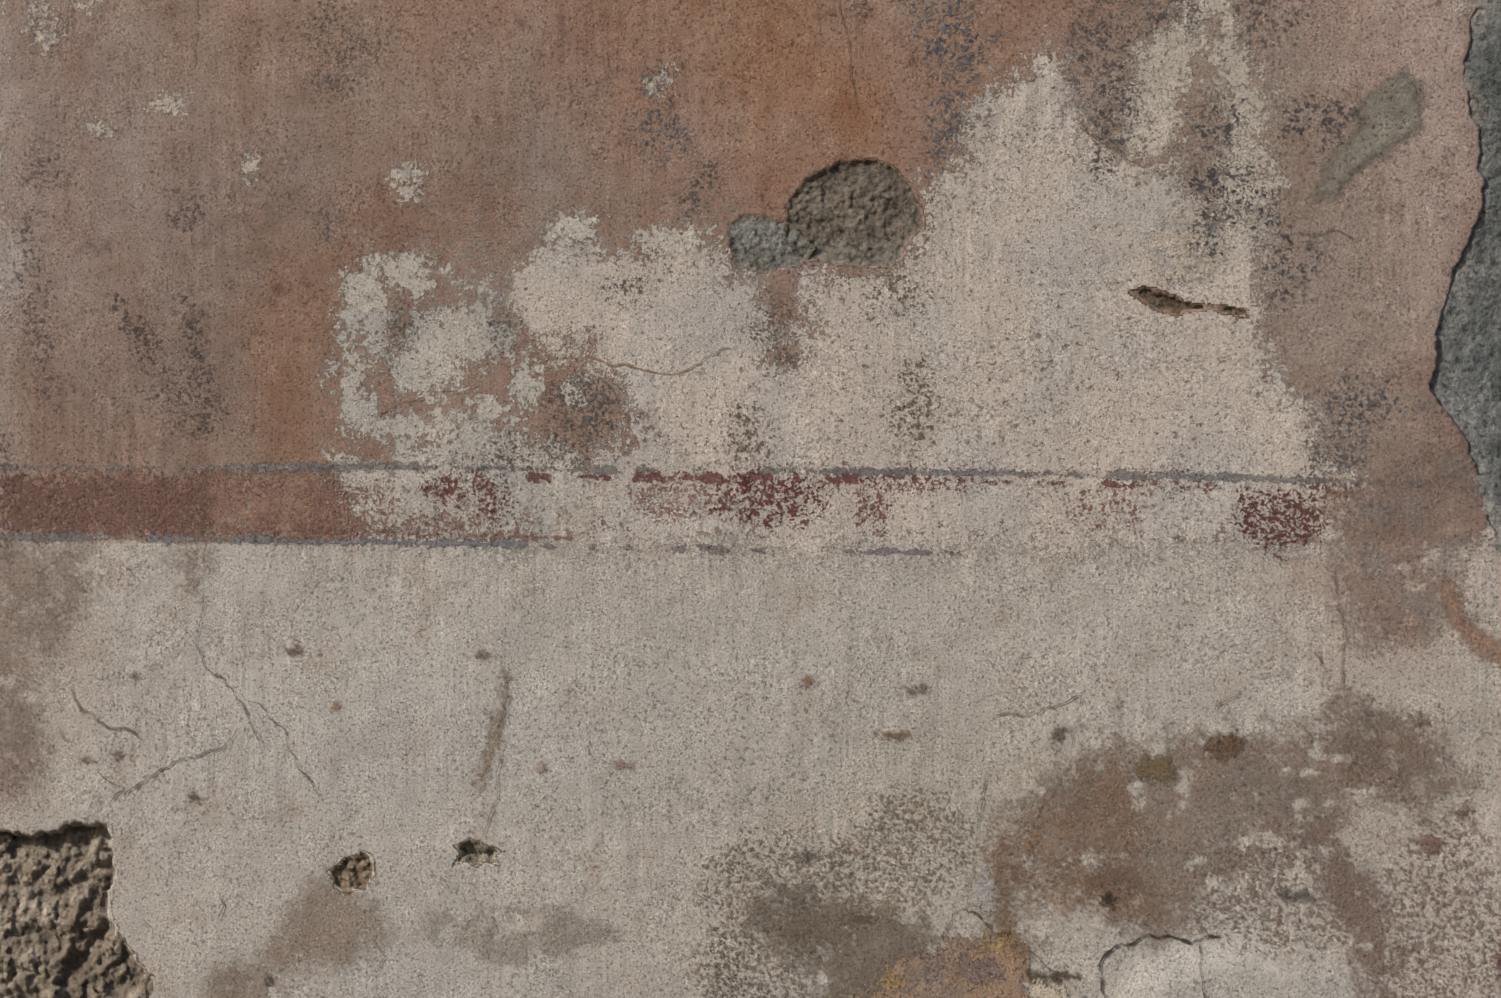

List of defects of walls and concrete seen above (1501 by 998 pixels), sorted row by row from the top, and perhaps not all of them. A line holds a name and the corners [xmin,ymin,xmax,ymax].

peeling [310,0,1418,590]
peeling [1456,522,1501,646]
crack [60,600,319,804]
leakage [479,671,509,790]
spalling [0,816,155,998]
spalling [325,850,376,896]
spalling [851,860,1079,998]
leakage [684,687,1501,998]
crack [1098,933,1221,998]